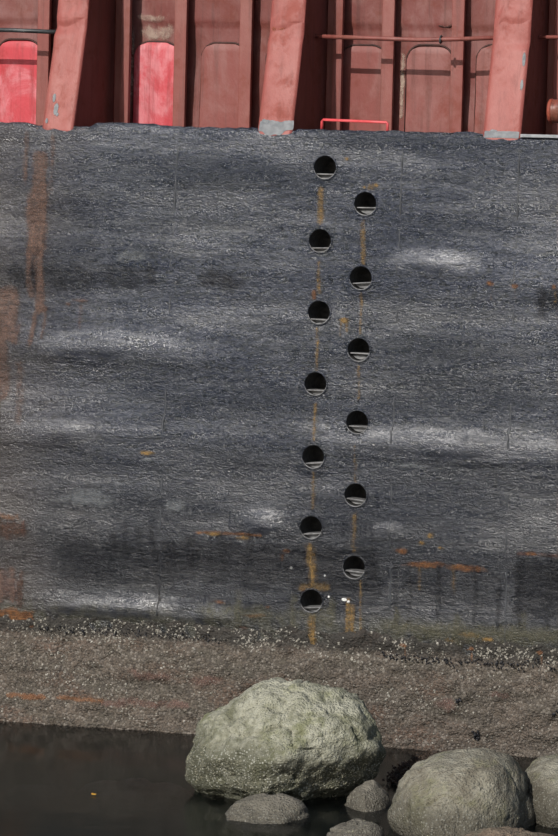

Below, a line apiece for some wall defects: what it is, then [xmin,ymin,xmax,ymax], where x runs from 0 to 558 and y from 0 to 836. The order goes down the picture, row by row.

water stain [61,526,380,595]
corrosion [299,544,330,591]
water stain [513,553,558,627]